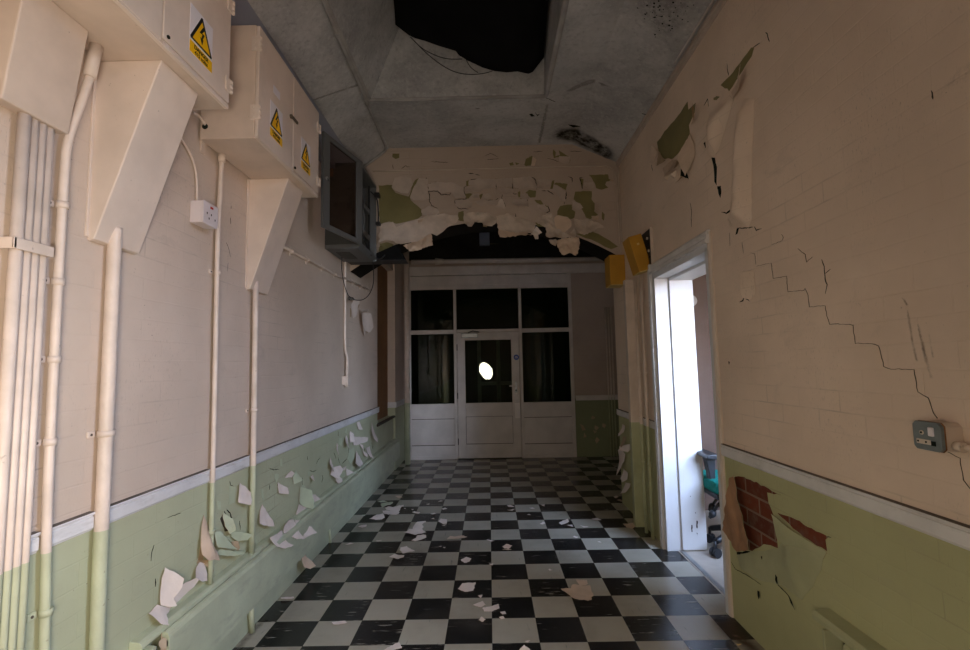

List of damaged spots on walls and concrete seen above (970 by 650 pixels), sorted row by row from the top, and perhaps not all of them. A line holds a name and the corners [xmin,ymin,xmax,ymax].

peeling [379,176,429,224]
peeling [557,174,614,221]
crack [729,233,937,418]
peeling [330,422,378,484]
peeling [149,470,320,625]
spalling [722,475,828,559]